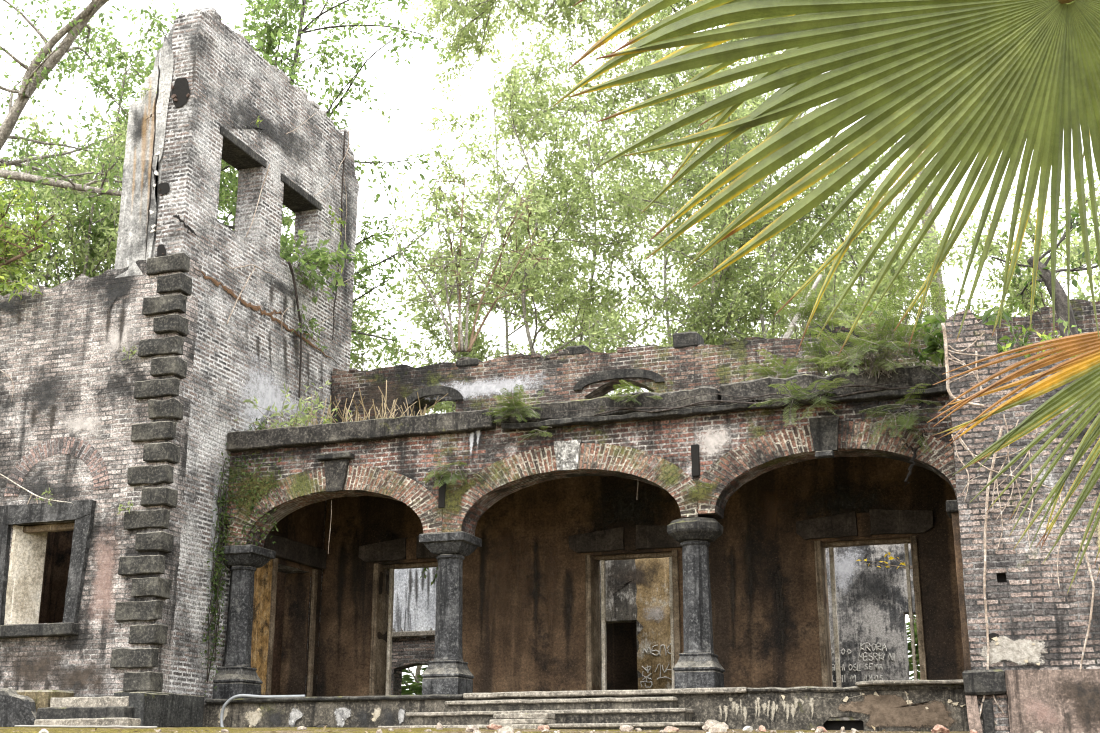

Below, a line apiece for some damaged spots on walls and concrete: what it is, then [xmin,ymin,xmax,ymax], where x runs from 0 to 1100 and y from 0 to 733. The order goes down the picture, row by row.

crack [145,60,199,255]
leakage [266,275,296,322]
leakage [28,369,98,435]
leakage [27,478,78,503]
leakage [564,572,573,647]
leakage [849,566,897,606]
spalling [814,691,964,728]